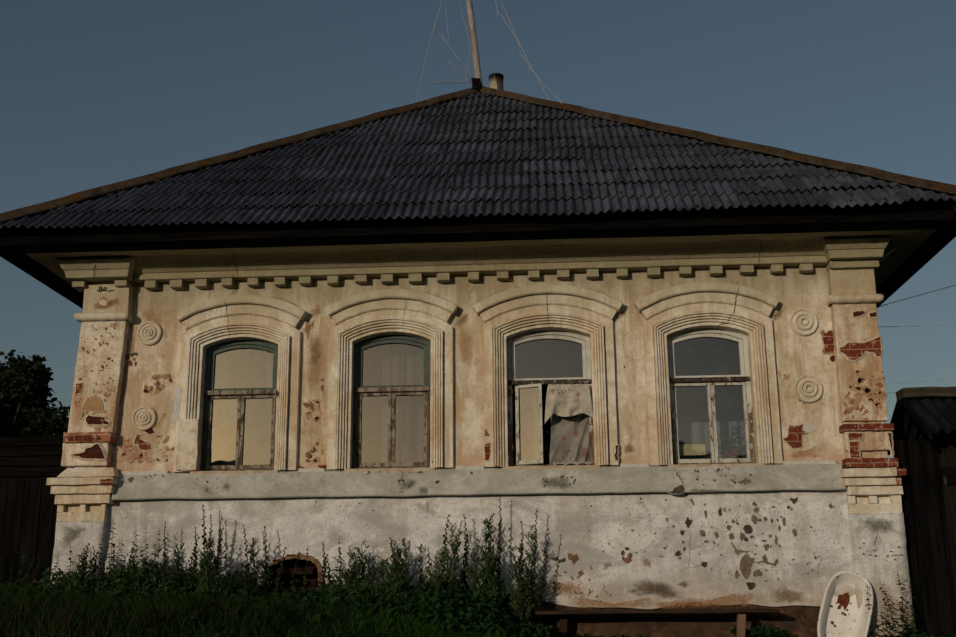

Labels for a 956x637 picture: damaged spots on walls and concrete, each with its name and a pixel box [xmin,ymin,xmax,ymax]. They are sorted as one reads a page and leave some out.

spalling [851,309,878,319]
peeling [125,352,139,367]
peeling [819,329,887,459]
peeling [64,357,181,483]
spalling [782,422,816,450]
spalling [886,431,894,457]
peeling [637,471,844,591]